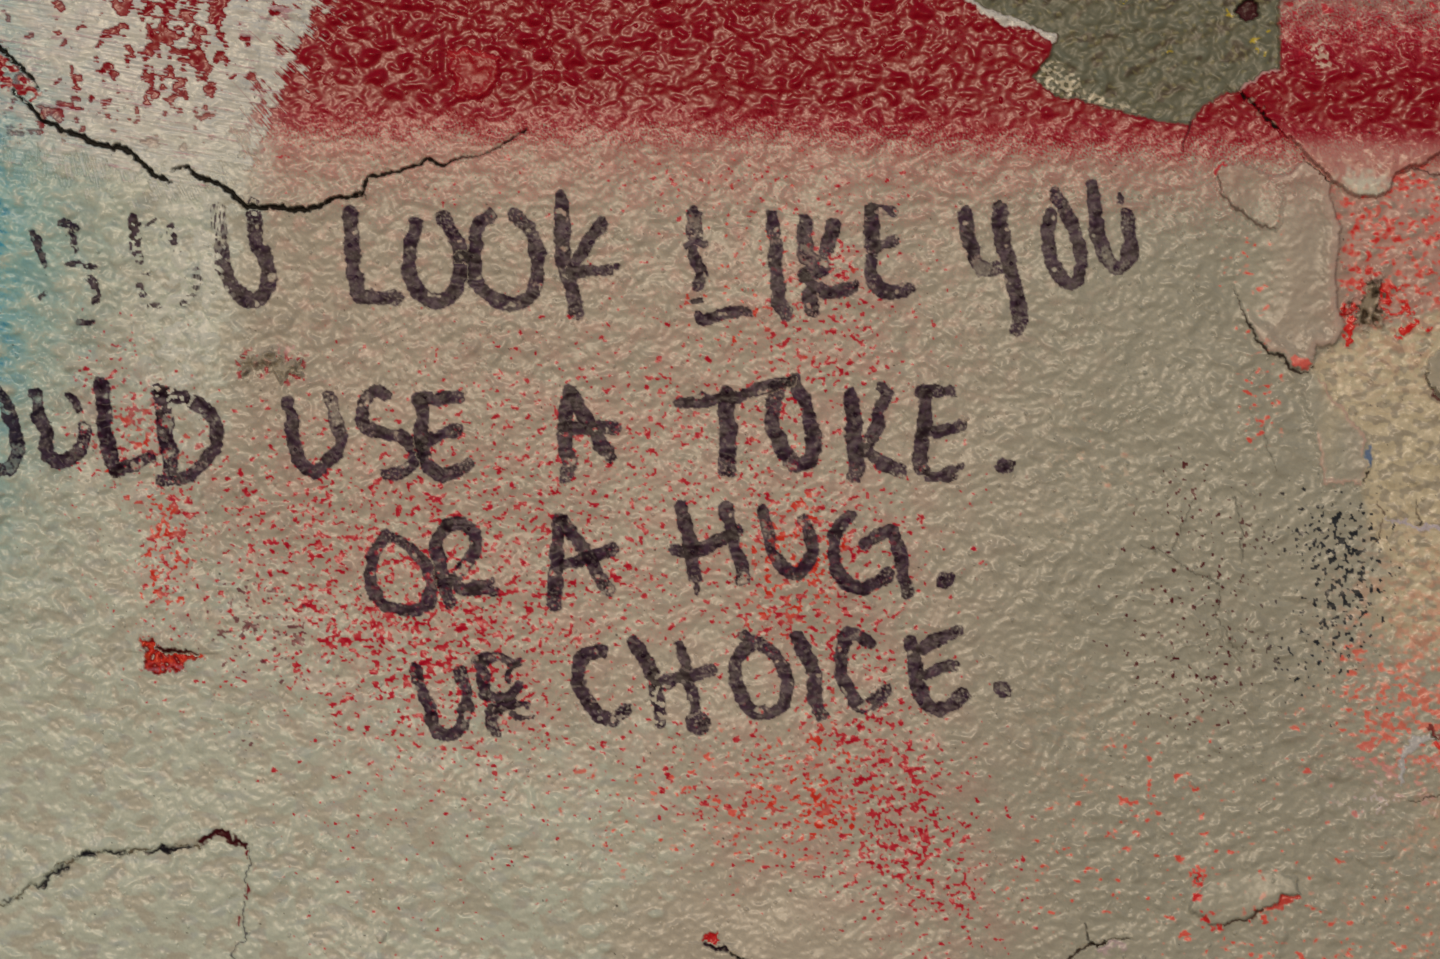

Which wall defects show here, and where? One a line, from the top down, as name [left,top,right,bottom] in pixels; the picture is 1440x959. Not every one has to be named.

peeling [962,0,1283,126]
crack [0,43,529,216]
peeling [1210,129,1440,376]
peeling [1424,348,1440,405]
crack [229,846,253,959]
crack [721,945,750,959]
crack [1042,921,1131,959]
peeling [1189,866,1303,933]